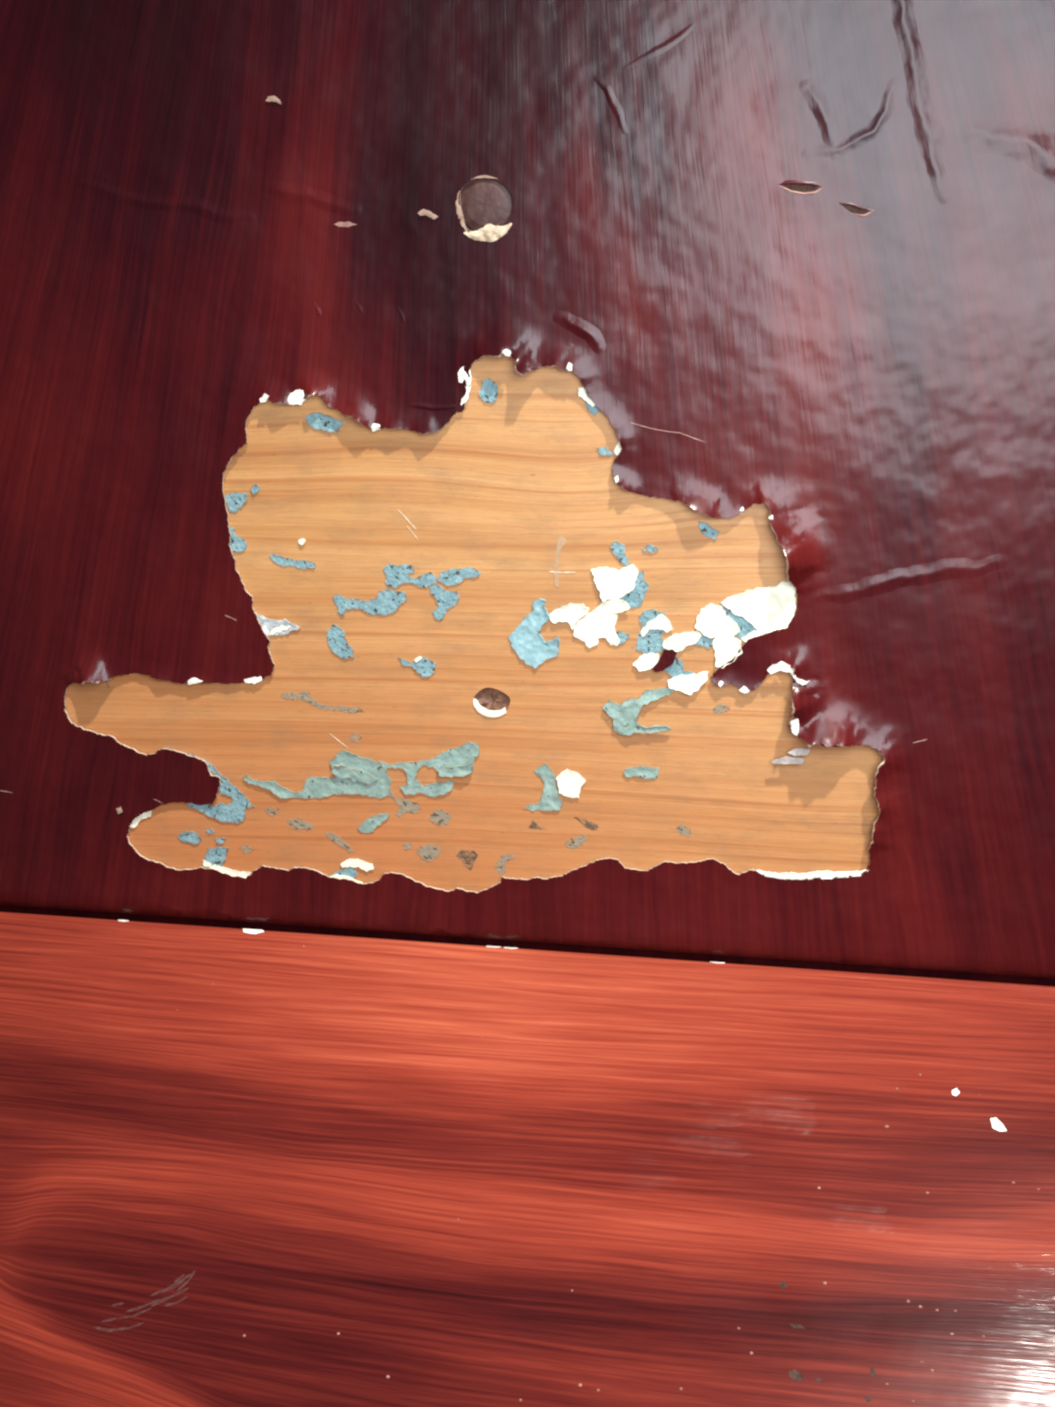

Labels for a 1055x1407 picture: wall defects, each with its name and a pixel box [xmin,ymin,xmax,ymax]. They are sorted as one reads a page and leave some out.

peeling [20,298,934,949]